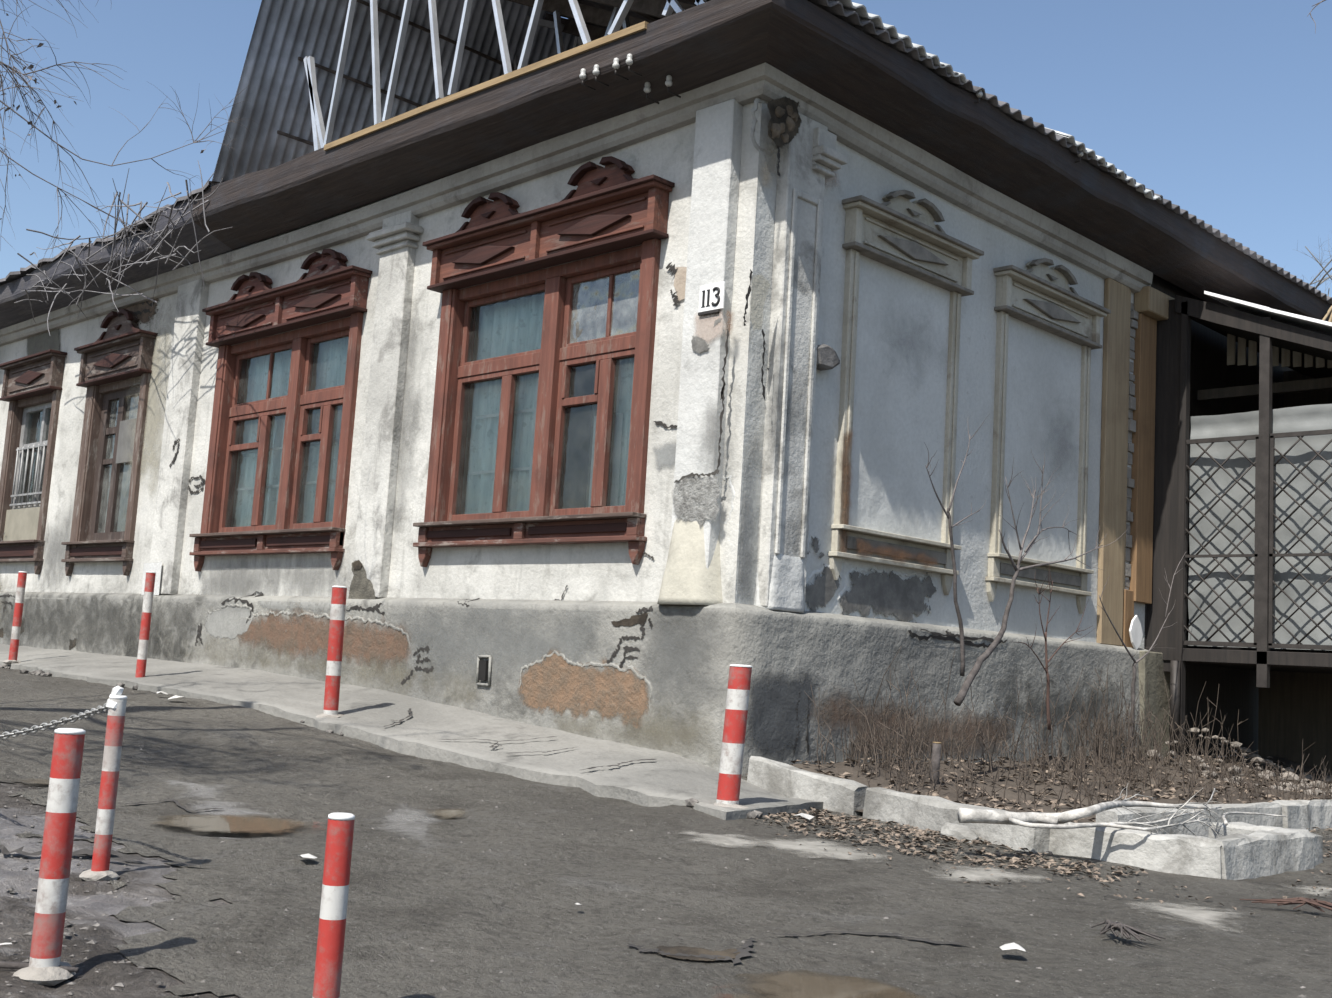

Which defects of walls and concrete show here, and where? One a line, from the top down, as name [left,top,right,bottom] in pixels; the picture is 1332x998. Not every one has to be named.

peeling [691,313,725,353]
crack [674,269,766,483]
peeling [672,475,735,528]
rust [840,432,936,566]
flaking render [348,560,388,599]
peeling [805,533,937,623]
flaking render [204,603,411,669]
crack [607,606,653,668]
flaking render [518,650,653,728]
leakage [745,675,814,756]